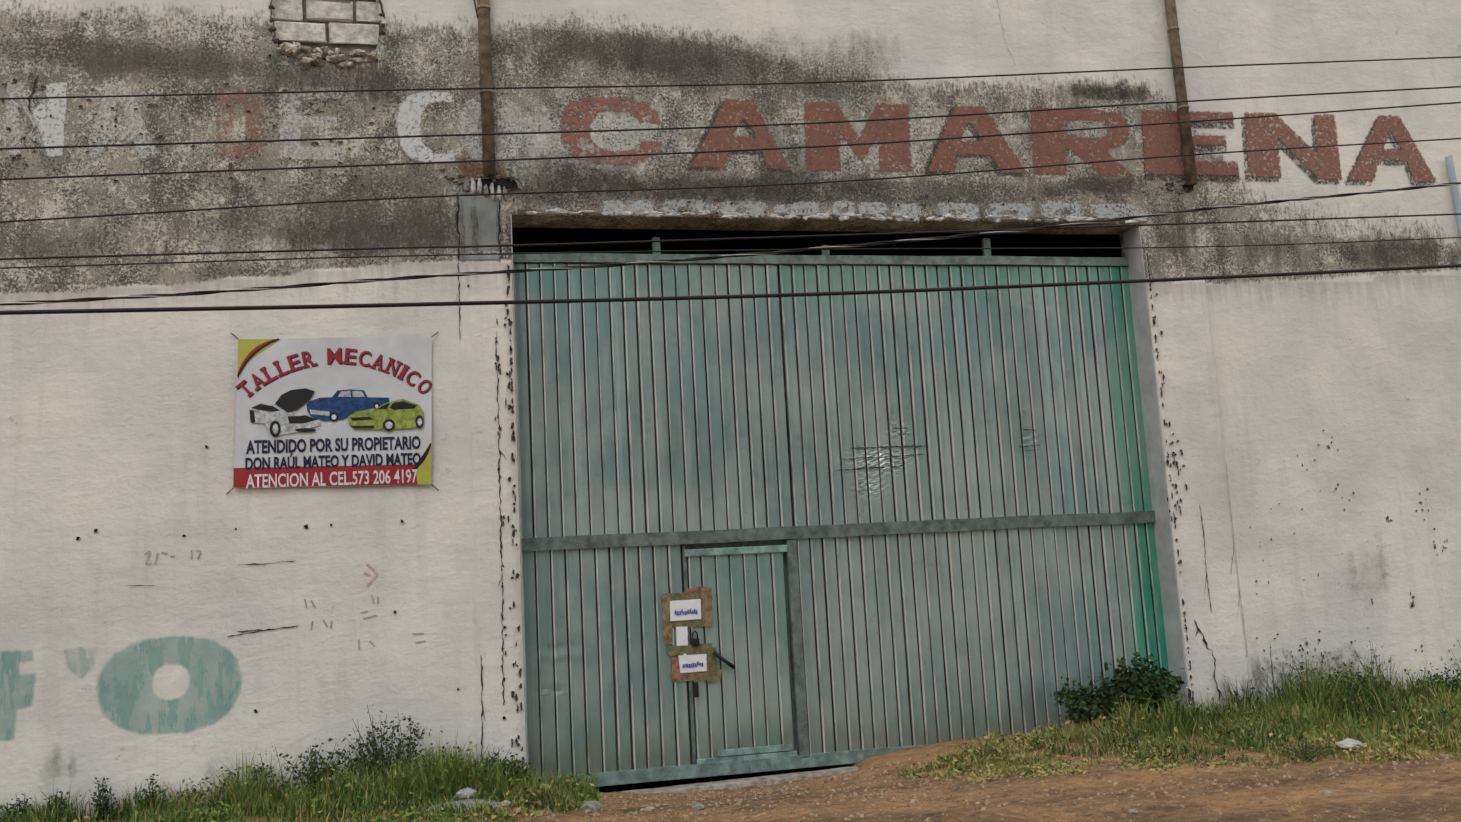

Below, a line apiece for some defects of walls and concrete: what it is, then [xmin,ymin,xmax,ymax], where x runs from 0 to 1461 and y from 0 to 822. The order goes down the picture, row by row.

flaking render [268,5,379,68]
mould [1073,81,1146,100]
leakage [564,165,812,201]